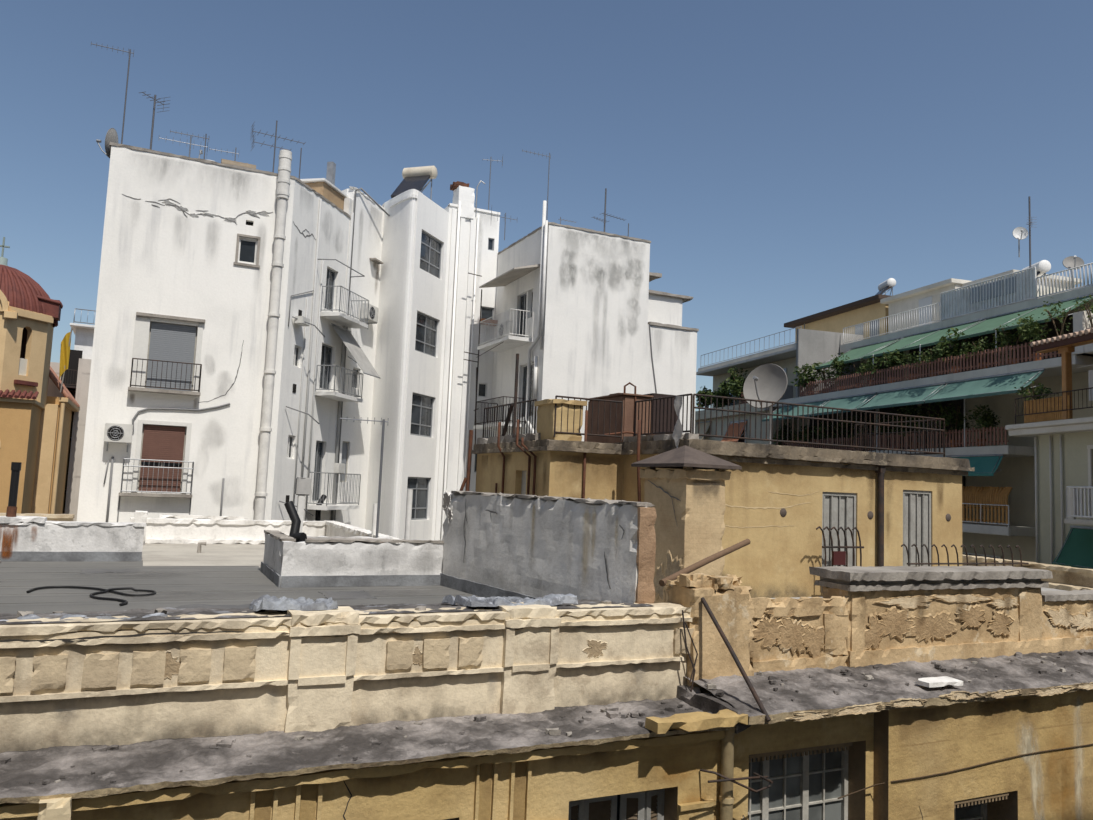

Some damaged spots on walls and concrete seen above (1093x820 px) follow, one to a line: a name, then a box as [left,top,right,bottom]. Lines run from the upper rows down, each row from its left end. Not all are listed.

crack [122,194,316,240]
peeling [442,489,453,525]
rust [2,529,17,557]
peeling [752,606,825,659]
peeling [863,593,1019,650]
peeling [1044,605,1093,631]
damp [1020,729,1042,818]